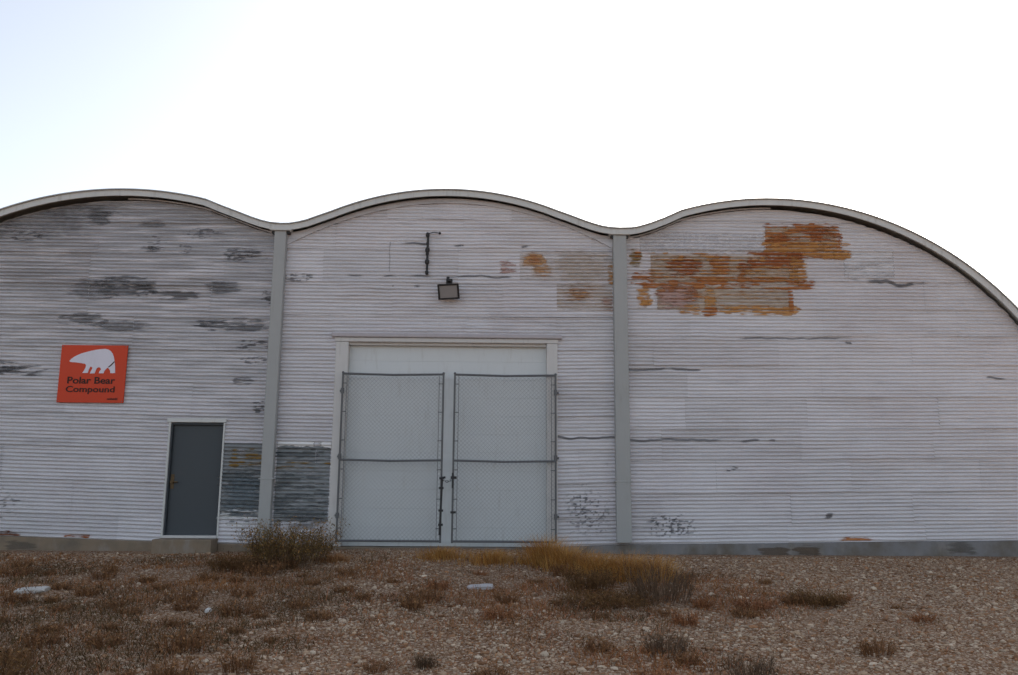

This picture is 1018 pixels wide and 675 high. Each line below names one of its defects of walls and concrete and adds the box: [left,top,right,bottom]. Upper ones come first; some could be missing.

peeling [59,313,143,330]
rust [500,254,613,311]
rust [629,223,851,316]
peeling [217,443,262,527]
peeling [273,441,331,528]